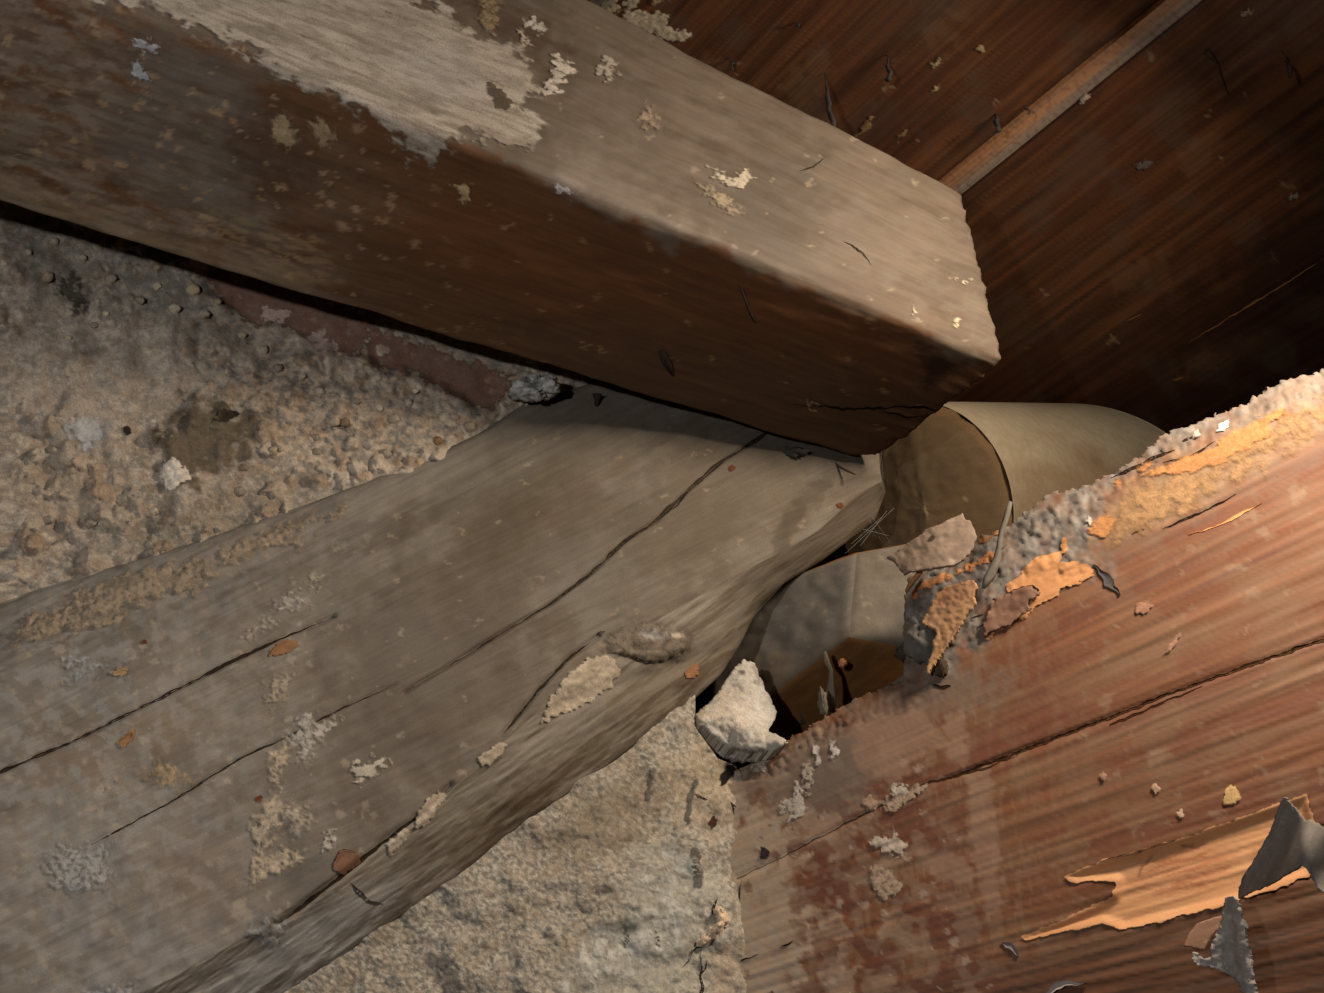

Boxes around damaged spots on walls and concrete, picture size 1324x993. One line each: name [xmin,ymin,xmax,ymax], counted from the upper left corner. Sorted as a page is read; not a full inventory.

peeling [982,586,1040,637]
crack [684,639,1324,993]
peeling [1021,794,1324,993]